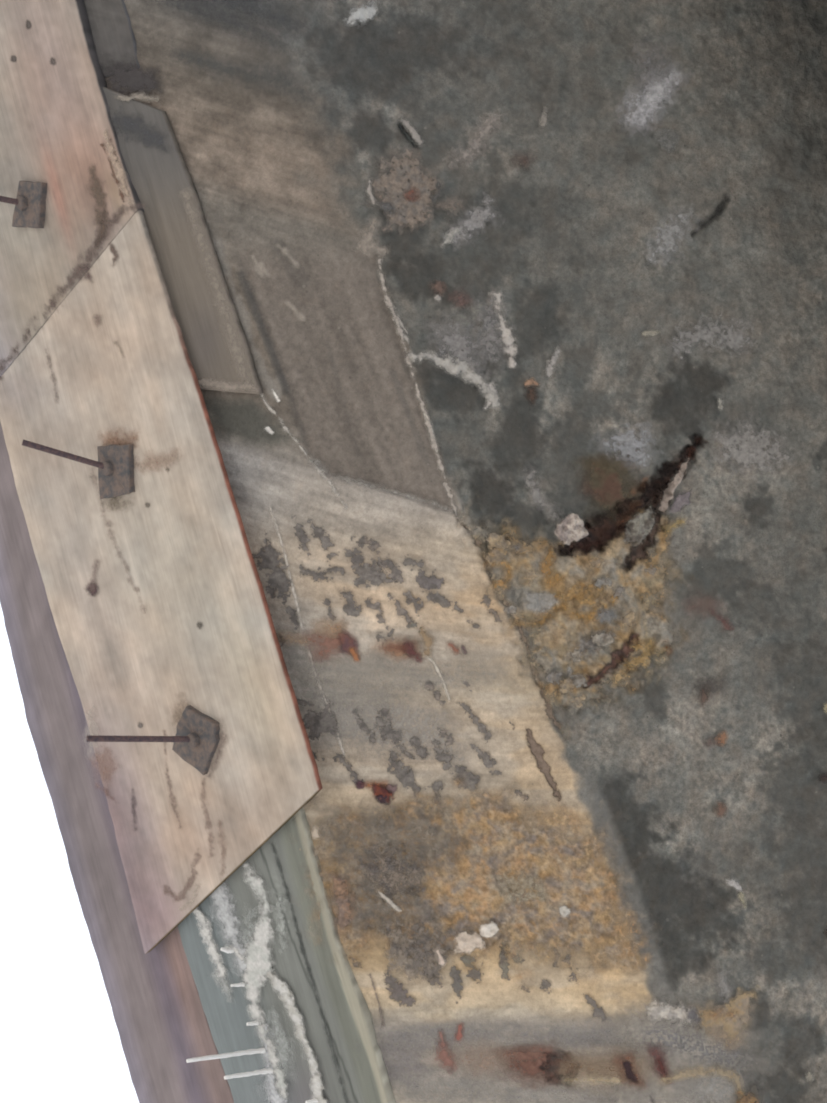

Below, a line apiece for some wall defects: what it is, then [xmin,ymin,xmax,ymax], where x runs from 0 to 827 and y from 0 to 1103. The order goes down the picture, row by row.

peeling [252,516,480,643]
crack [261,258,561,801]
spalling [461,435,703,715]
efflorescence [193,864,327,1103]
rust [436,1024,759,1103]